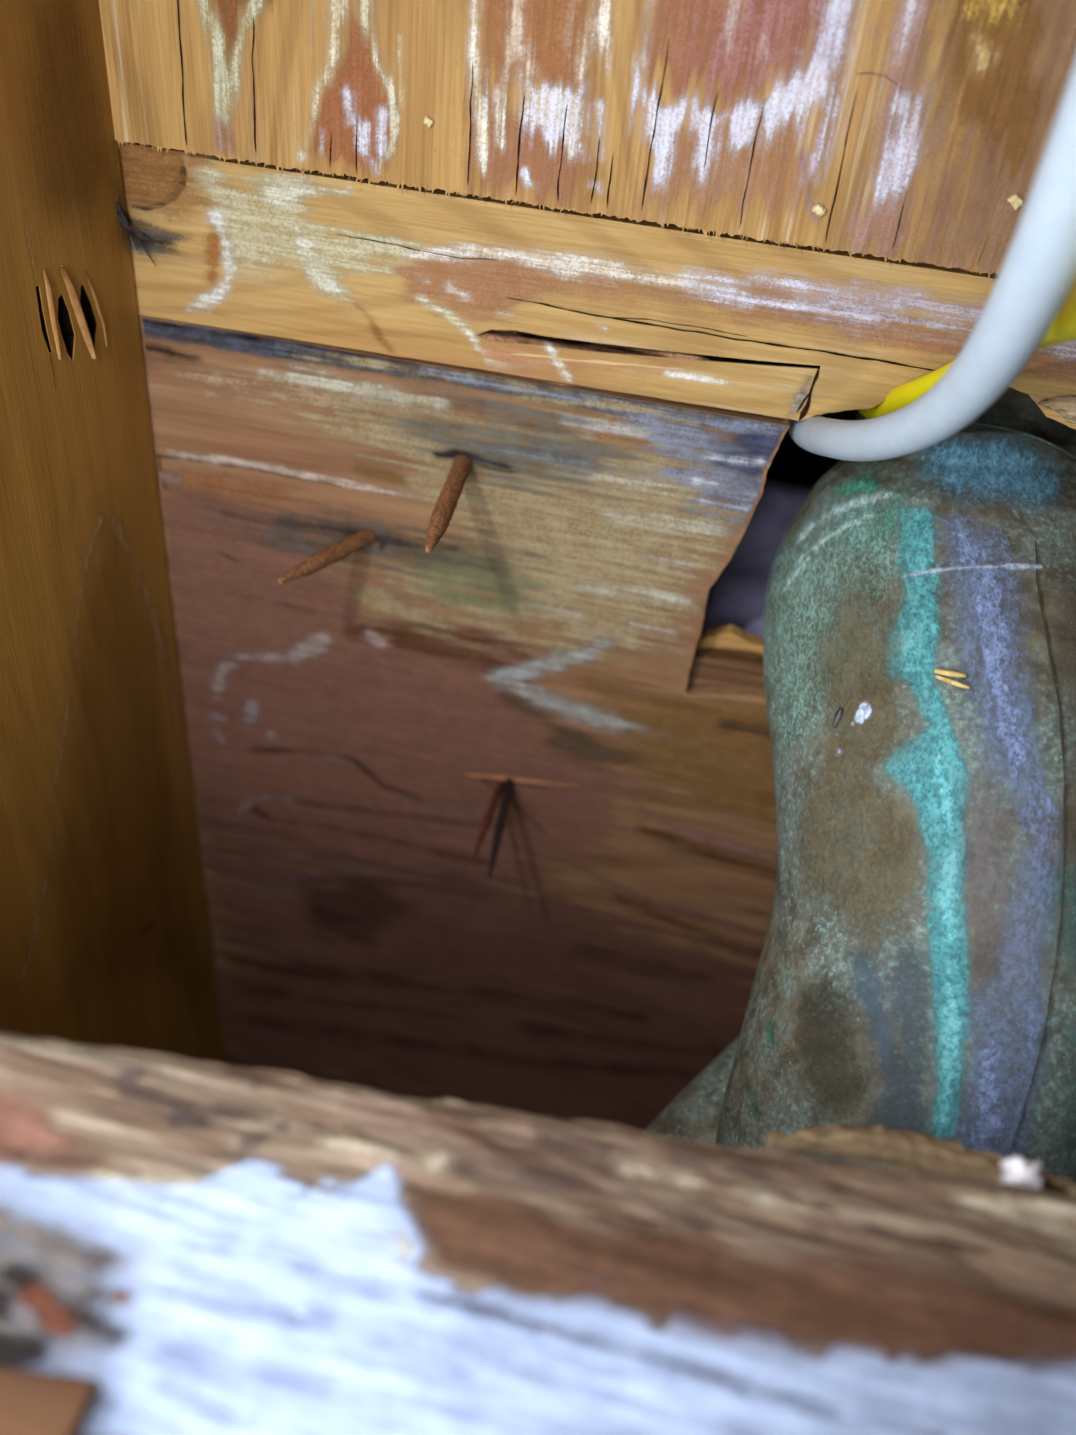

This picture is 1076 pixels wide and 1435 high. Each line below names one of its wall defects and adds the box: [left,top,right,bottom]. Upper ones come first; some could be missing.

crack [330,126,357,162]
crack [739,99,766,228]
crack [825,72,922,250]
crack [337,234,494,260]
crack [506,297,935,421]
damp [74,0,1076,1159]
damp [325,1138,474,1172]
damp [534,1133,705,1187]
peeling [0,1161,1076,1435]
damp [411,1191,1076,1369]